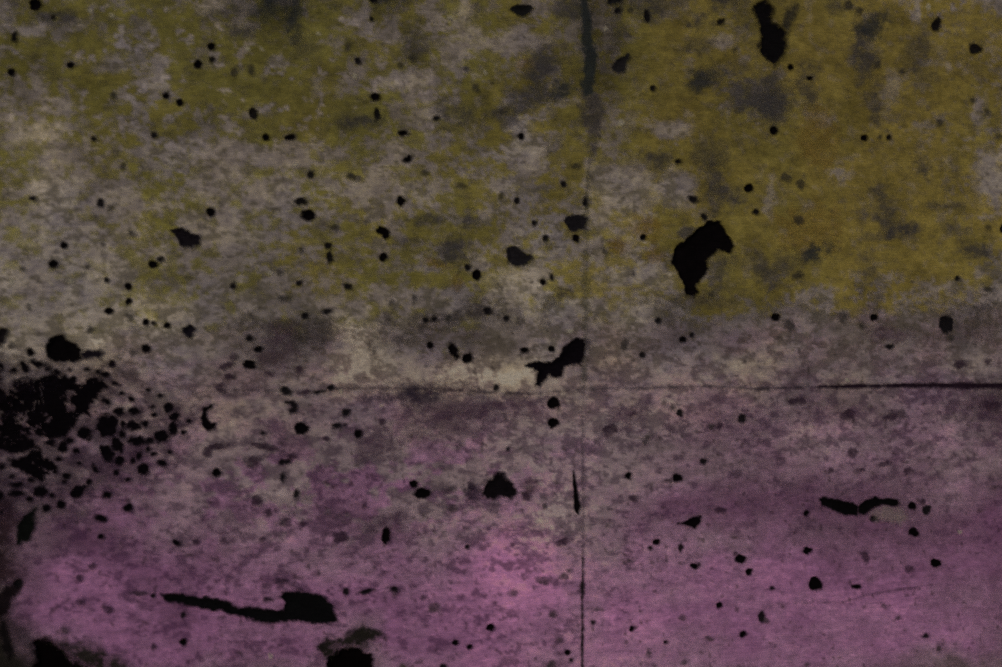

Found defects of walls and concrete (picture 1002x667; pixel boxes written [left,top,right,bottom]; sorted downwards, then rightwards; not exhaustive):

hole [751,0,800,66]
damp [0,0,1002,346]
hole [671,220,735,297]
crack [334,204,678,395]
hole [44,333,104,363]
hole [524,337,592,387]
crack [703,382,1002,391]
hole [462,471,517,511]
damp [0,355,1002,667]
crack [578,431,586,667]
hole [30,637,126,667]
hole [131,577,386,667]